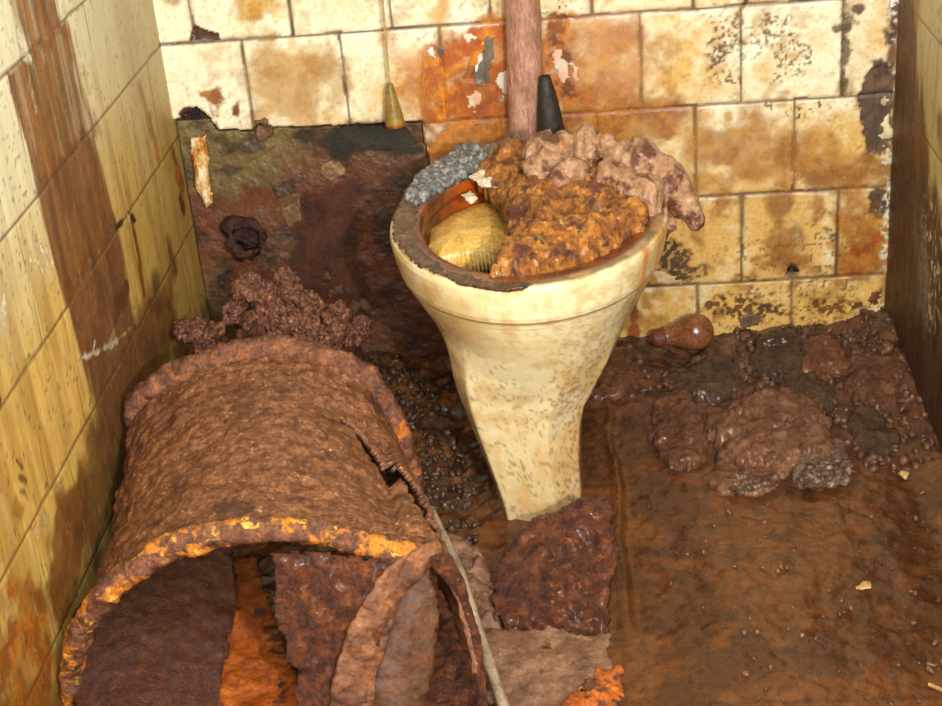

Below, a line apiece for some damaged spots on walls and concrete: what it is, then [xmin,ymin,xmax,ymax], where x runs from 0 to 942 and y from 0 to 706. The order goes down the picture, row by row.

rust [8,0,139,442]
rust [128,212,145,297]
rust [172,149,185,215]
spalling [176,106,448,356]
peeling [416,31,444,58]
rust [407,15,508,163]
peeling [464,34,507,113]
rust [542,13,686,142]
leakage [653,240,706,286]
leakage [688,0,942,449]
spalling [857,0,899,273]
rust [0,486,90,706]